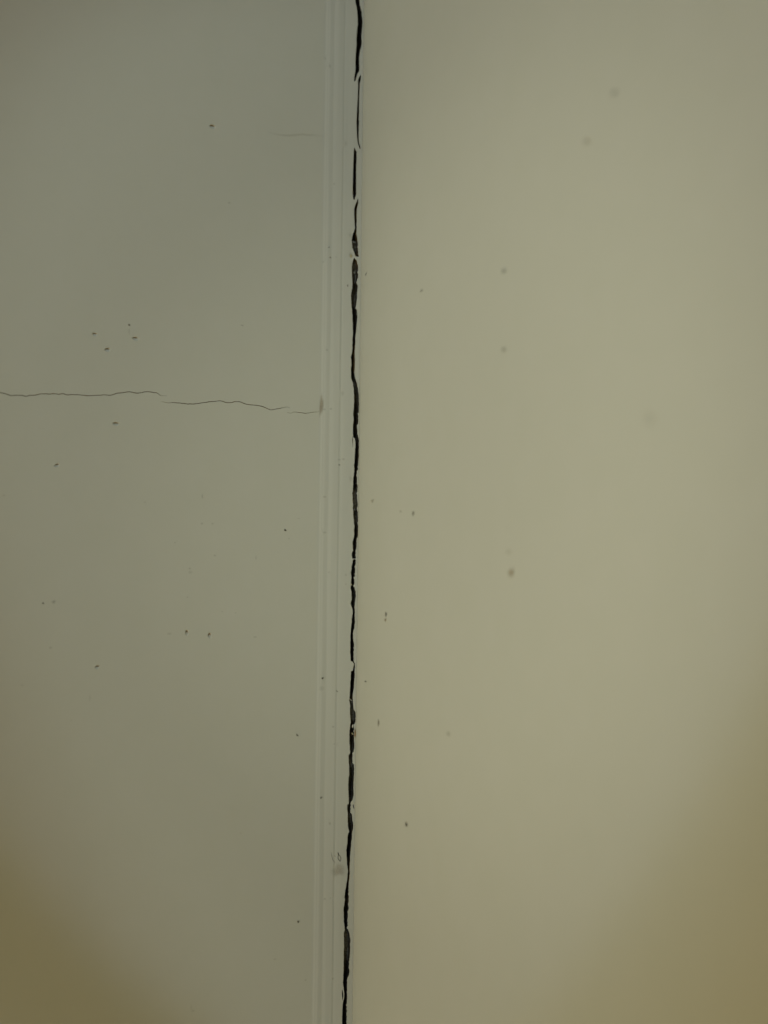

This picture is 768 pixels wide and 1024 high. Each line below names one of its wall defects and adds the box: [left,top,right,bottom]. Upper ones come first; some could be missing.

crack [0,391,312,414]
crack [342,0,363,1024]